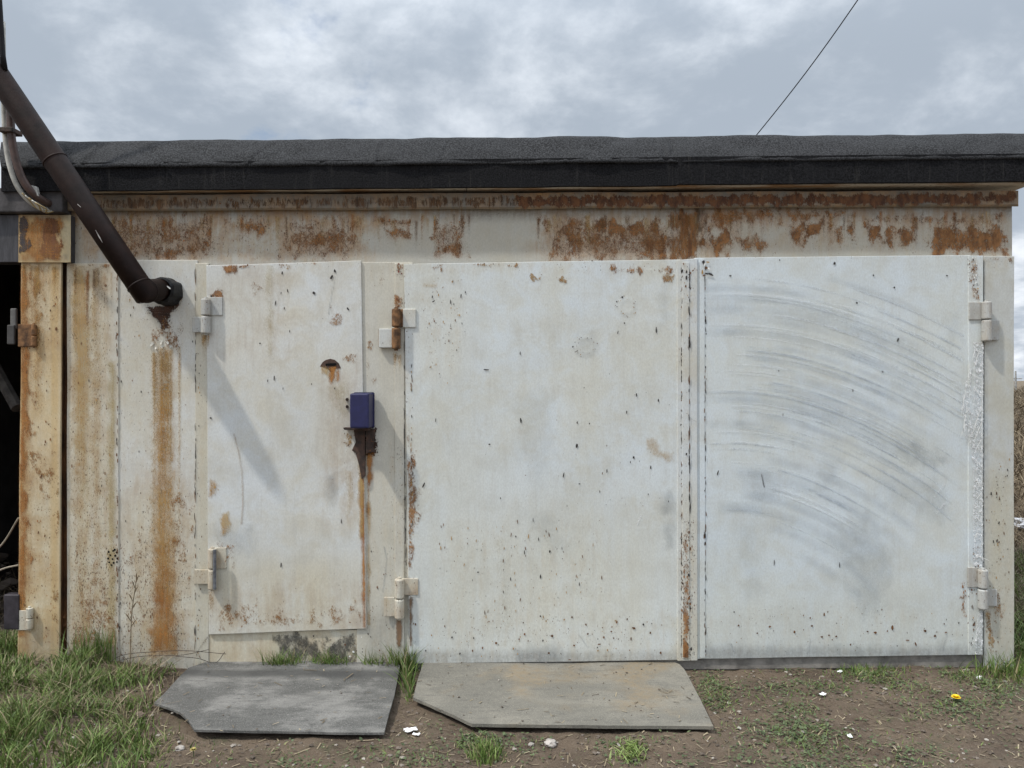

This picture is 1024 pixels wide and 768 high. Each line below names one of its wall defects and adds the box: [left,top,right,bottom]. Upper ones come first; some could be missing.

corrosion [100,191,1017,299]
corrosion [19,216,71,629]
corrosion [125,281,194,654]
corrosion [222,600,294,628]
water stain [275,632,363,662]
corrosion [310,427,391,637]
corrosion [407,457,421,567]
corrosion [681,531,692,658]